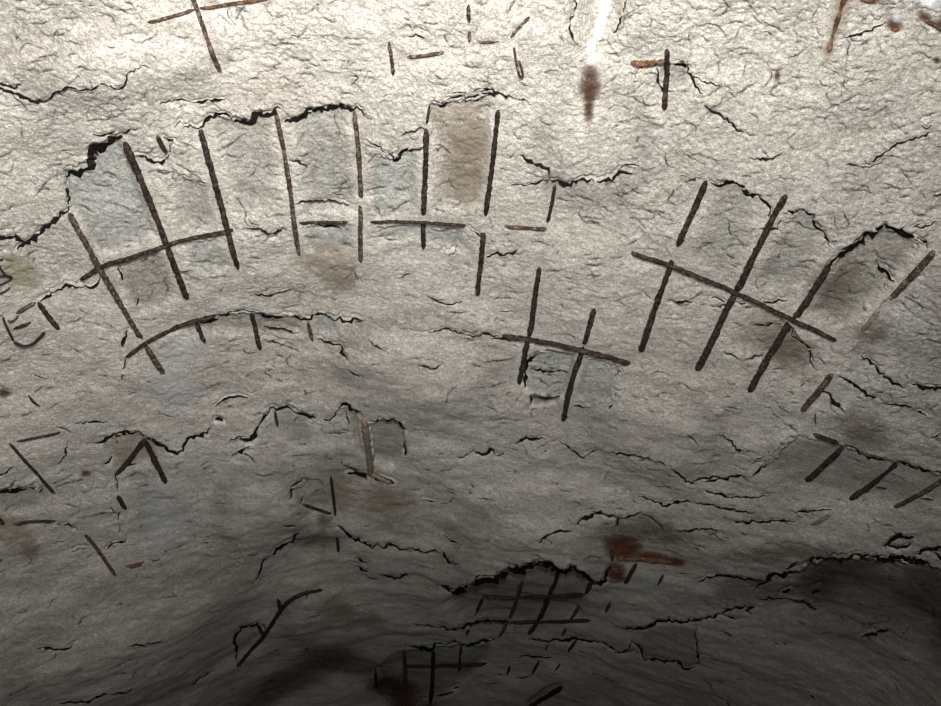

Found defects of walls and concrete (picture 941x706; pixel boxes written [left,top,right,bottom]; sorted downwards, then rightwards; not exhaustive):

leakage [586,0,610,53]
crack [0,67,140,105]
spalling [66,129,334,374]
crack [0,98,425,249]
spalling [475,232,486,296]
spalling [484,110,501,217]
spalling [505,184,556,231]
spalling [502,267,631,422]
spalling [631,194,941,392]
crack [845,445,941,474]
corrosion [606,536,685,582]
spalling [374,561,593,706]